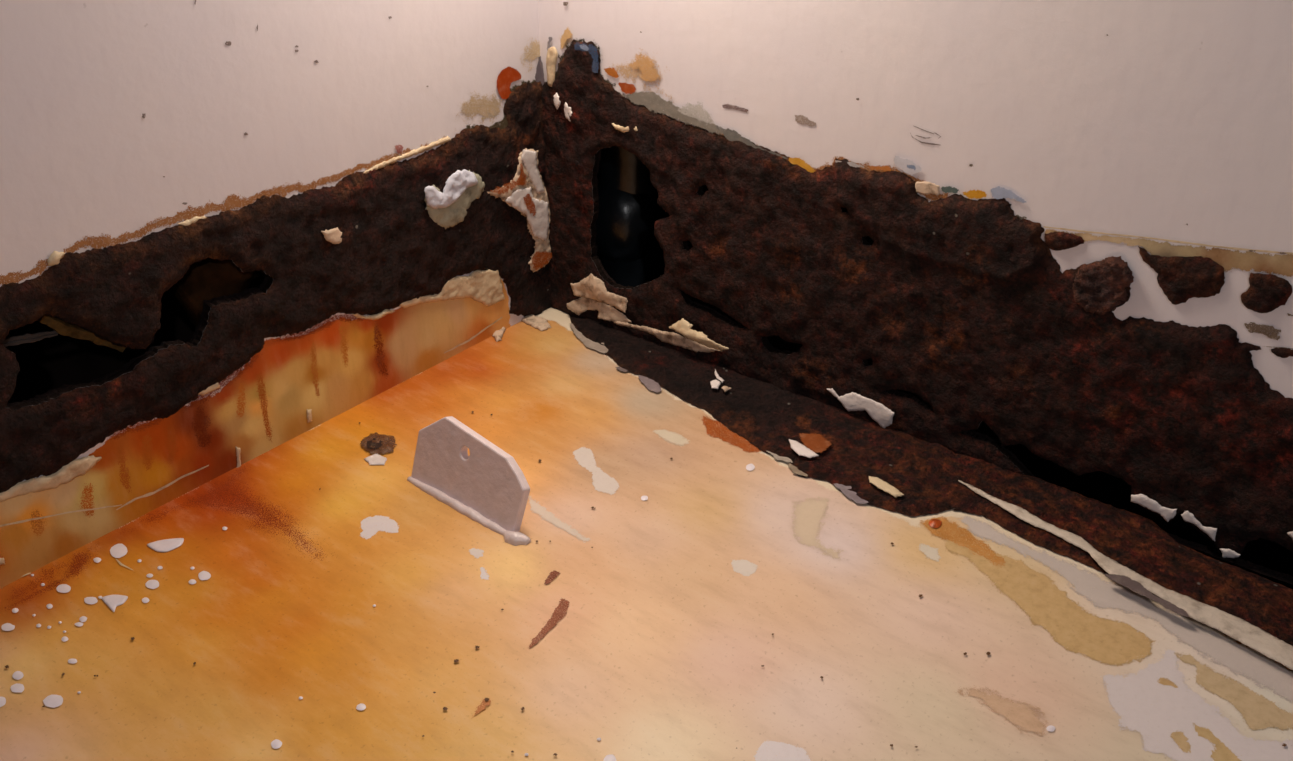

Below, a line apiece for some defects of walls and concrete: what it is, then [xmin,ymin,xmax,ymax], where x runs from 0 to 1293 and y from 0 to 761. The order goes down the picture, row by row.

rust [609,61,643,94]
rust [629,54,674,103]
peeling [553,93,572,121]
peeling [505,149,550,241]
rust [523,192,536,216]
peeling [47,251,65,266]
rust [1138,246,1225,305]
rust [1241,273,1292,313]
peeling [1245,322,1281,340]
rust [1271,347,1293,358]
peeling [198,383,221,396]
rust [1193,718,1244,761]